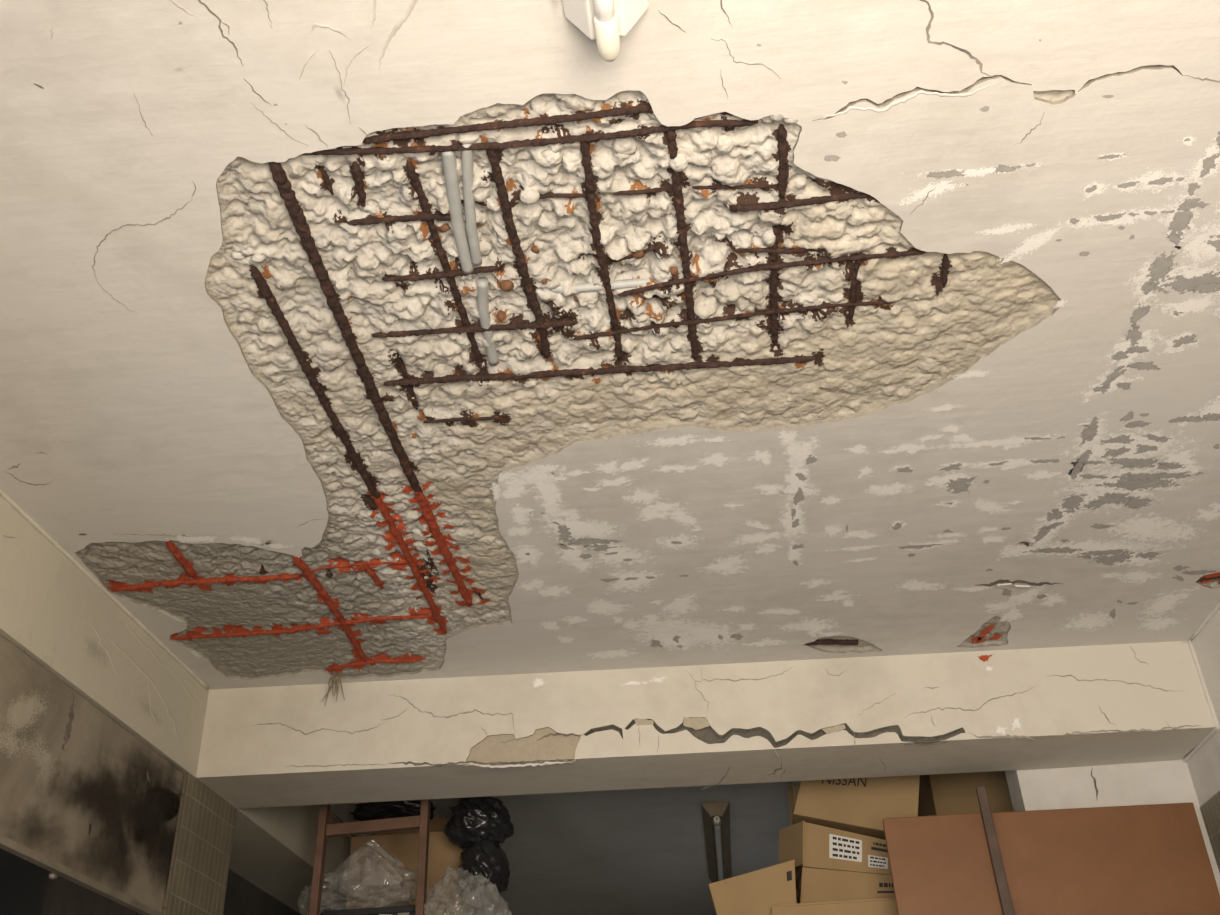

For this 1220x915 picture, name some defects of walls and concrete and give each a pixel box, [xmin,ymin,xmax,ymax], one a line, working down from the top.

crack [198,0,328,147]
crack [330,52,367,135]
crack [713,0,781,96]
crack [814,0,1088,144]
crack [1149,65,1220,83]
spalling [77,90,1220,677]
damp [0,687,174,882]
crack [585,646,1202,790]
crack [1090,770,1098,801]